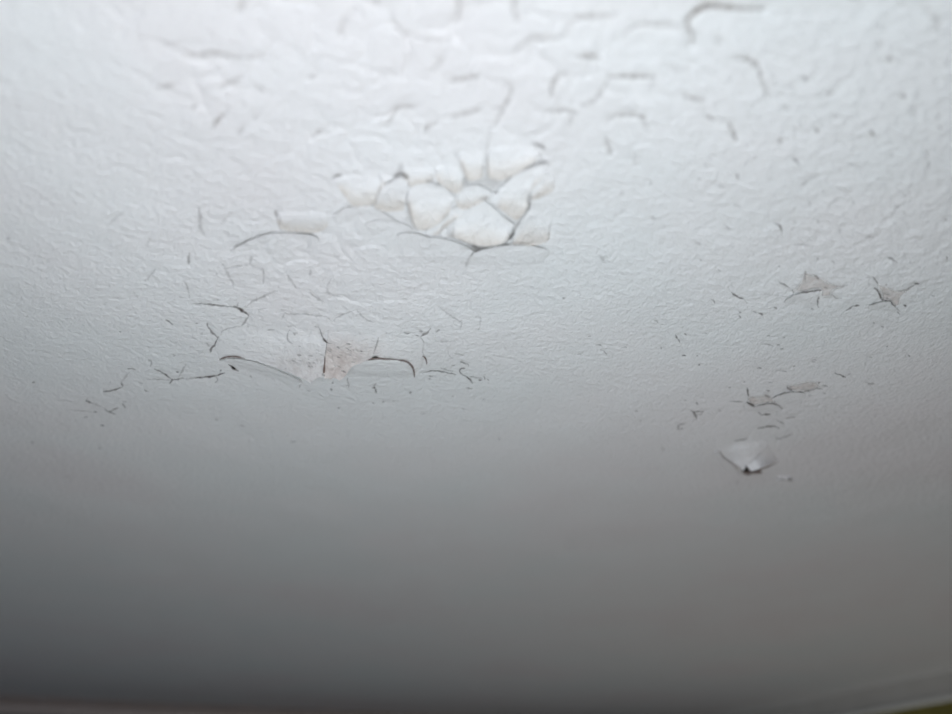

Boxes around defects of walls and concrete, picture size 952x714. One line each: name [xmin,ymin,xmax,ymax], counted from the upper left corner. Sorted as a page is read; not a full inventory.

peeling [747,275,835,305]
peeling [868,287,909,312]
peeling [216,326,427,386]
peeling [744,382,818,413]
peeling [713,440,779,479]